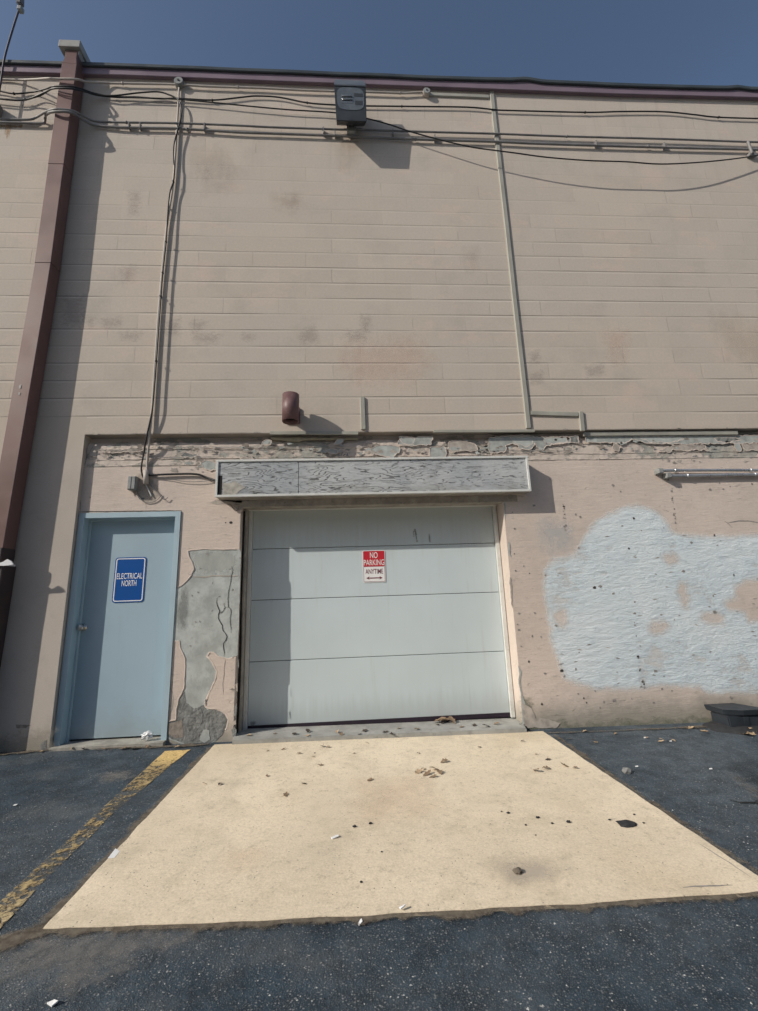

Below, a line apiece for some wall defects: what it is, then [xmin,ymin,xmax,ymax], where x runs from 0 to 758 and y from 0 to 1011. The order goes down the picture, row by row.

peeling [90,433,215,473]
peeling [239,427,758,464]
flaking render [167,548,241,744]
crack [216,569,233,680]